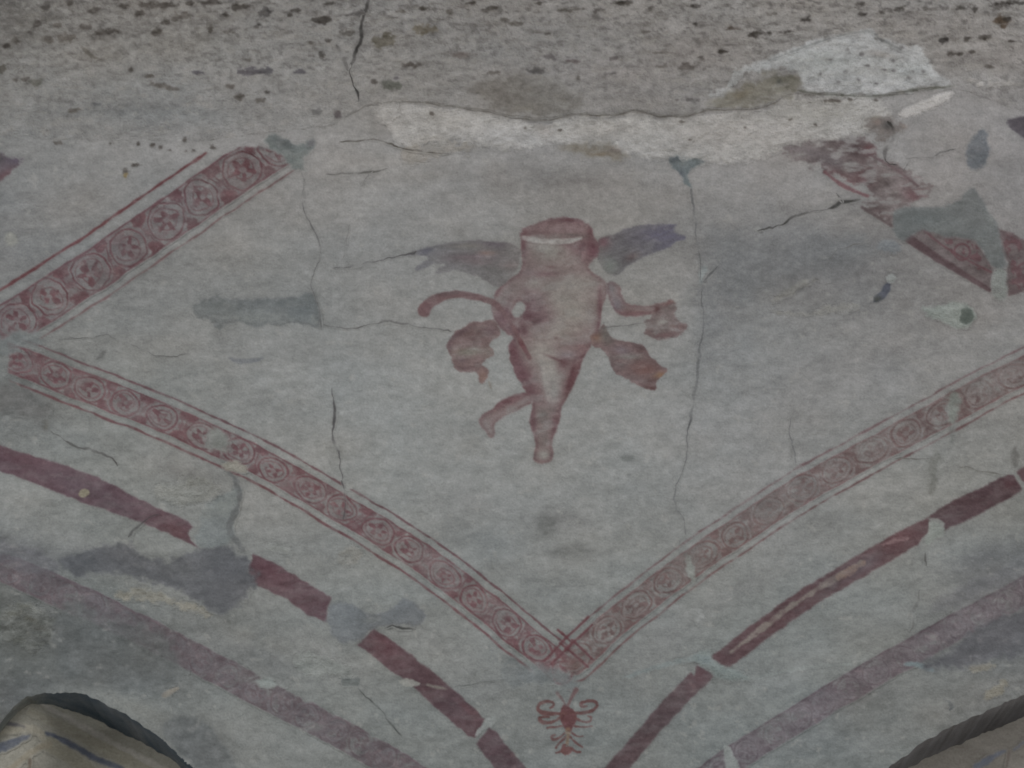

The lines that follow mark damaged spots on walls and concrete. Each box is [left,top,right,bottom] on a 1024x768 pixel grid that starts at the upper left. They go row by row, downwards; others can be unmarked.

crack [334,0,372,101]
spalling [366,0,1024,169]
crack [757,193,862,232]
crack [671,188,719,535]
crack [329,388,348,520]